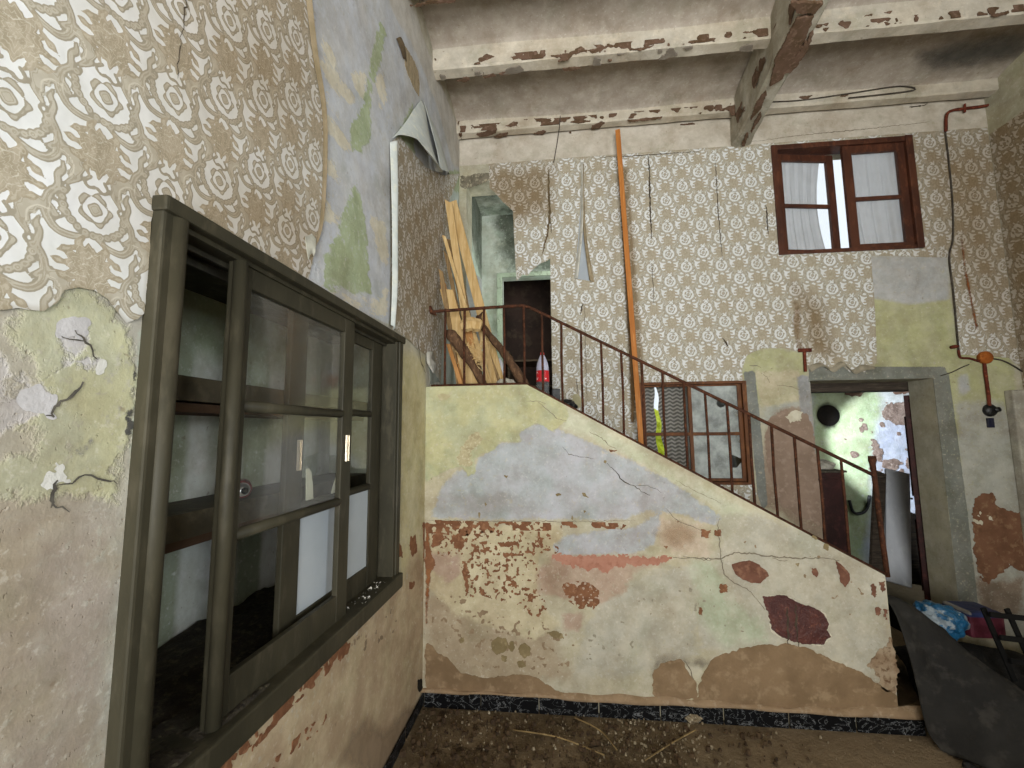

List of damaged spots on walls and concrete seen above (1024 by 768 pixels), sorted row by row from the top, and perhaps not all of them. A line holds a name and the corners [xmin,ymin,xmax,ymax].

peeling [864,11,919,27]
peeling [977,4,1024,17]
peeling [440,0,851,146]
spalling [41,462,71,490]
crack [46,381,84,418]
crack [49,474,117,512]
crack [567,432,839,610]
spalling [859,391,909,472]
flaking render [972,492,1024,584]
flaking render [399,493,634,695]
peeling [221,609,405,768]
flaking render [652,594,900,708]